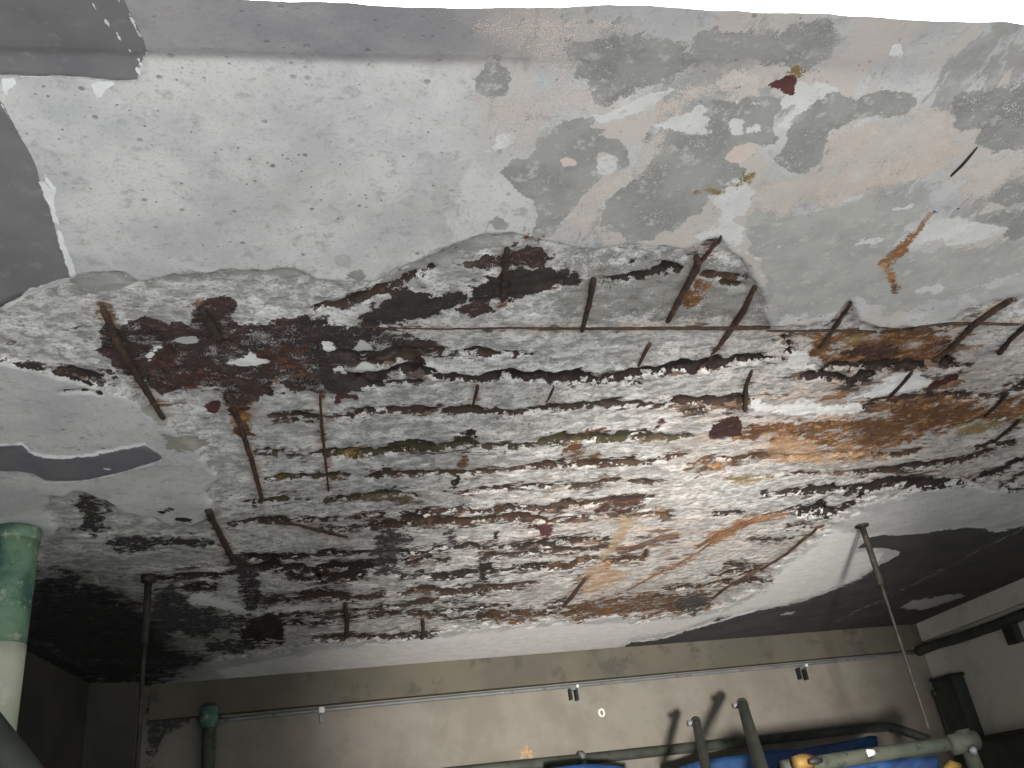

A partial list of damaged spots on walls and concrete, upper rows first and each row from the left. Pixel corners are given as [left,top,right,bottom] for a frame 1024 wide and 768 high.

corrosion [877,210,940,294]
corrosion [96,227,584,437]
spalling [0,76,1024,664]
corrosion [785,326,953,368]
corrosion [683,390,1024,486]
corrosion [562,494,721,624]
corrosion [693,509,774,547]
water stain [182,593,320,631]